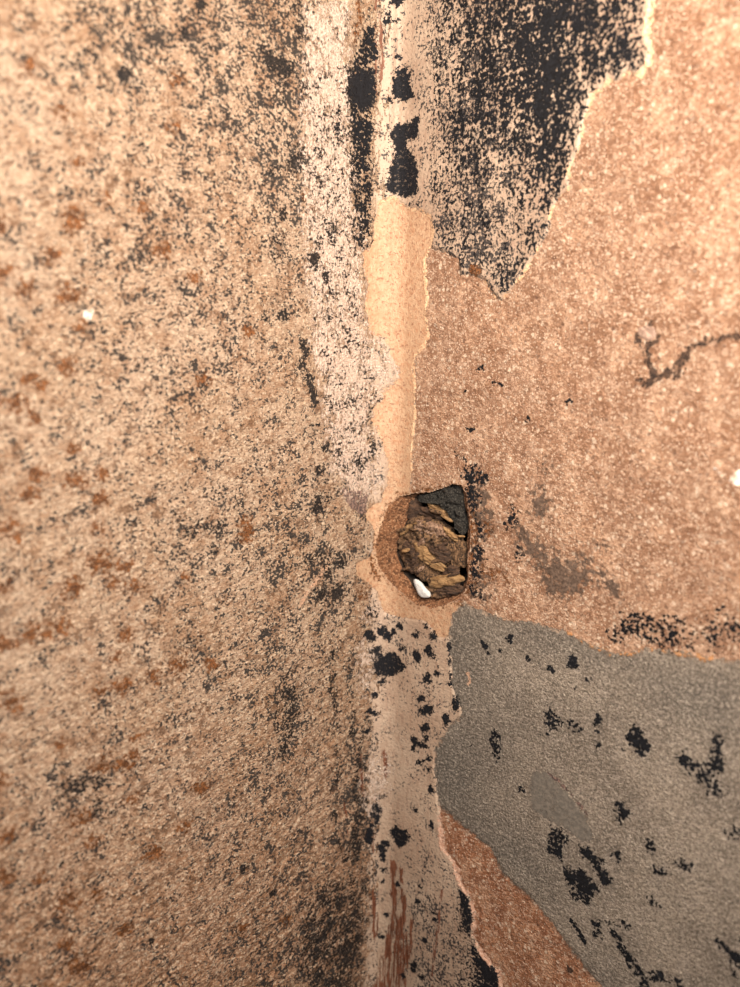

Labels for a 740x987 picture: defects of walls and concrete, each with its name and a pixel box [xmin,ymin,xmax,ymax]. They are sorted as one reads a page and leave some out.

peeling [342,0,740,661]
water stain [299,549,352,614]
water stain [542,654,580,685]
water stain [273,670,304,764]
water stain [540,704,603,749]
water stain [616,723,653,757]
water stain [289,600,462,987]
corrosion [371,859,414,987]
water stain [453,887,500,987]
peeling [437,805,602,987]
water stain [612,800,633,825]
water stain [644,836,694,876]